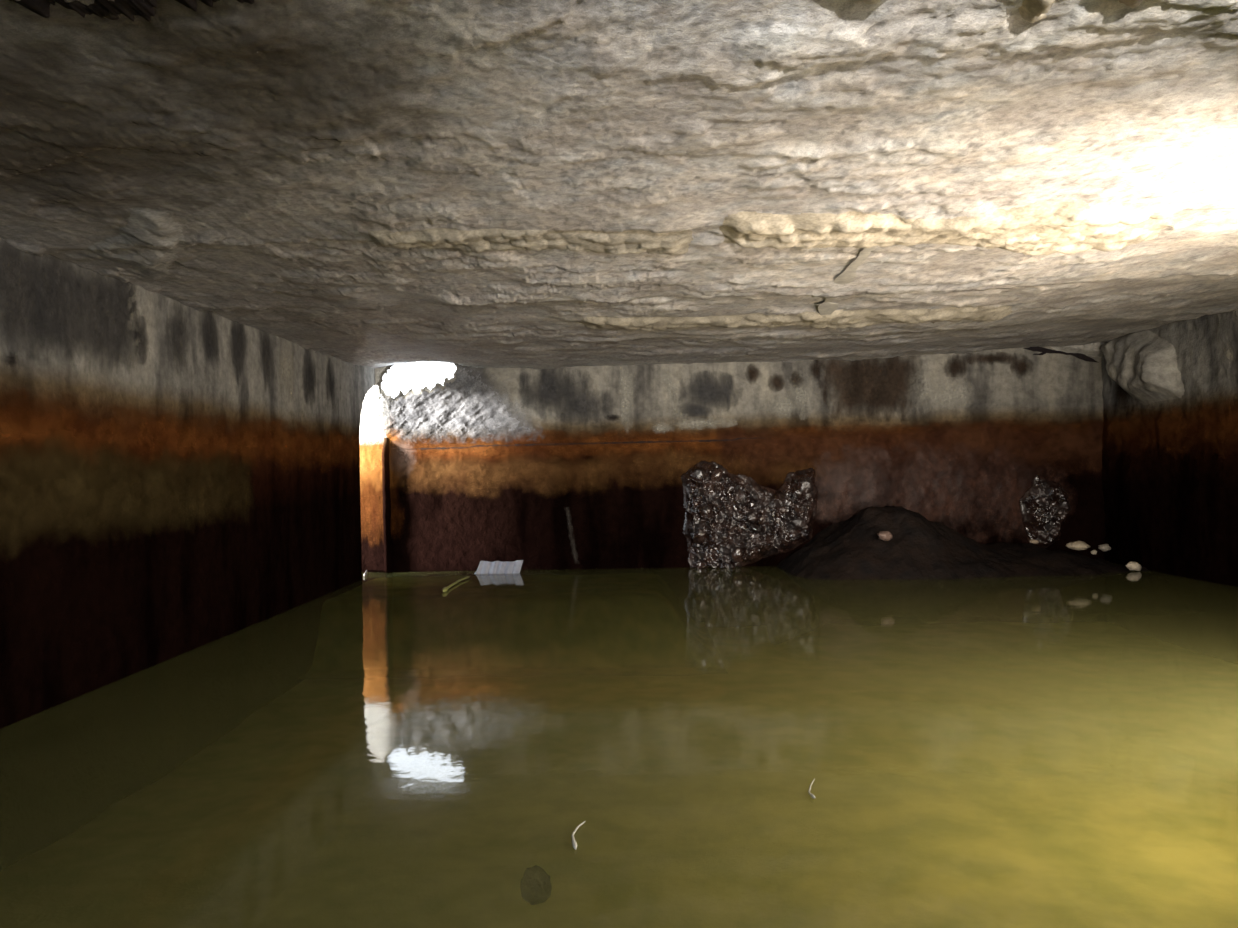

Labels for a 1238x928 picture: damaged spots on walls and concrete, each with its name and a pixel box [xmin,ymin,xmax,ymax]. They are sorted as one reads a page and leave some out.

crack [10,0,254,21]
water stain [0,0,398,191]
water stain [368,228,693,255]
water stain [719,201,1188,255]
water stain [0,208,196,364]
water stain [203,311,245,374]
water stain [262,332,334,402]
water stain [664,372,733,426]
water stain [579,306,1013,331]
water stain [748,353,1029,415]
rust [393,445,412,469]